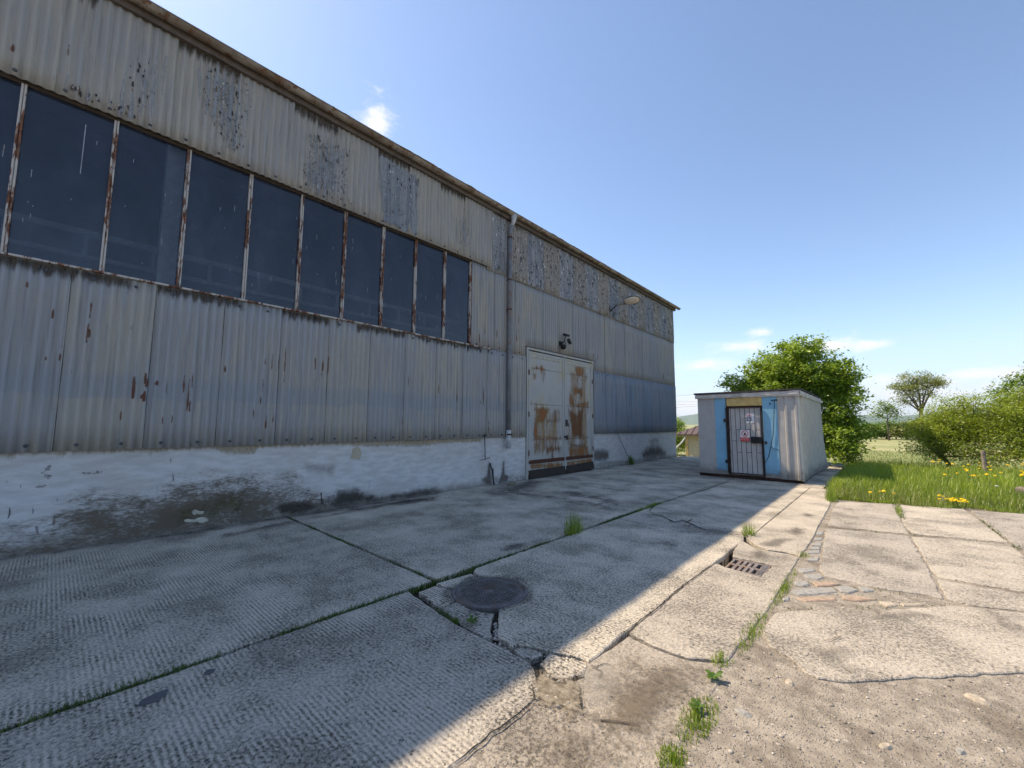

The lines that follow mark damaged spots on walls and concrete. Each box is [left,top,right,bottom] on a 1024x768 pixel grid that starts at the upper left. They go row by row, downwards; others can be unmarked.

peeling [197,62,251,153]
peeling [379,155,419,236]
peeling [492,213,674,341]
corrosion [131,373,167,402]
corrosion [531,366,592,469]
water stain [0,476,434,559]
crack [649,480,732,533]
spalling [531,671,586,719]